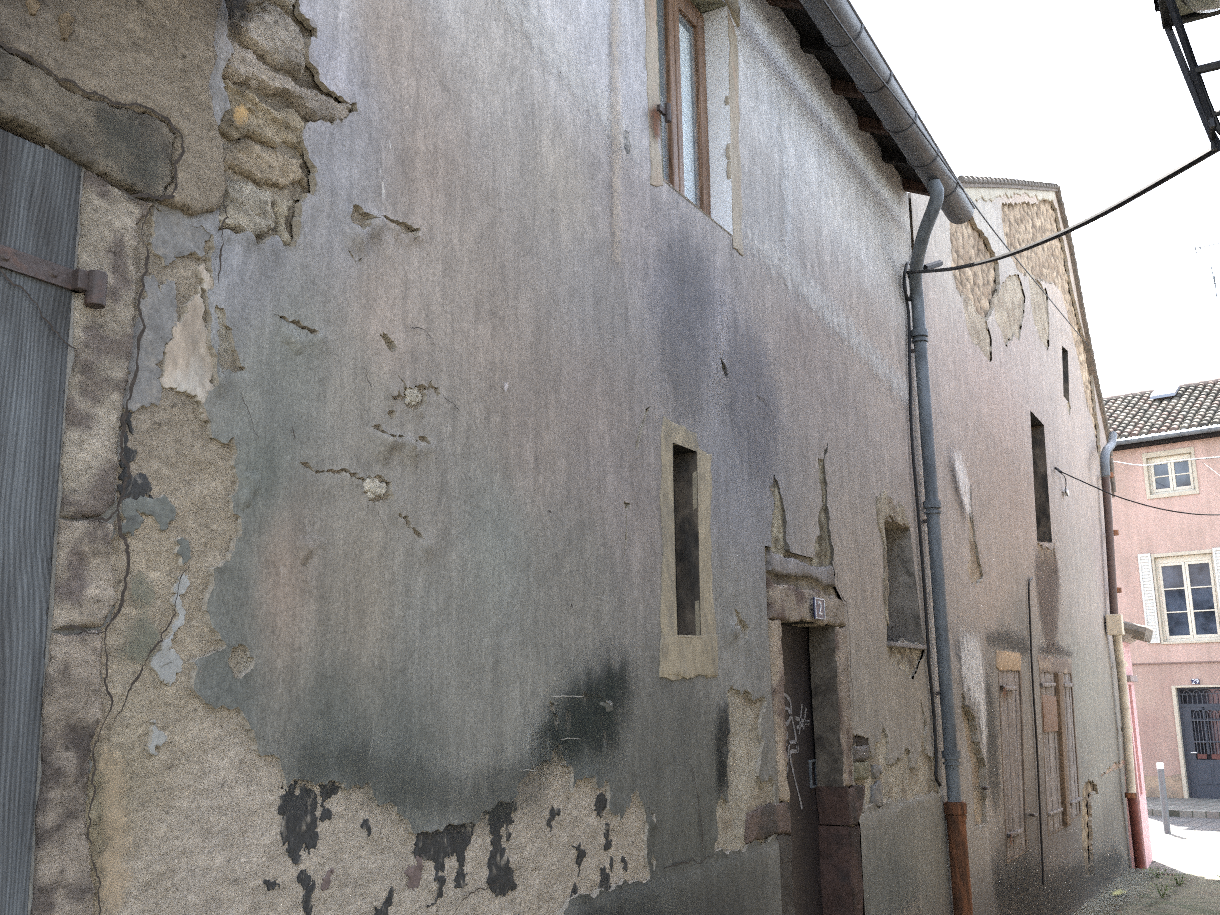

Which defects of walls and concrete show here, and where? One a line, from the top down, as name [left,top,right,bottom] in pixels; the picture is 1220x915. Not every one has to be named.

crack [216,197,229,287]
flaking render [949,199,1102,486]
crack [0,41,227,915]
flaking render [85,0,656,915]
flaking render [765,474,792,557]
flaking render [808,443,835,574]
water stain [542,661,630,758]
flaking render [714,685,776,856]
flaking render [851,699,941,815]
flaking render [961,693,989,831]
flaking render [1081,760,1124,878]